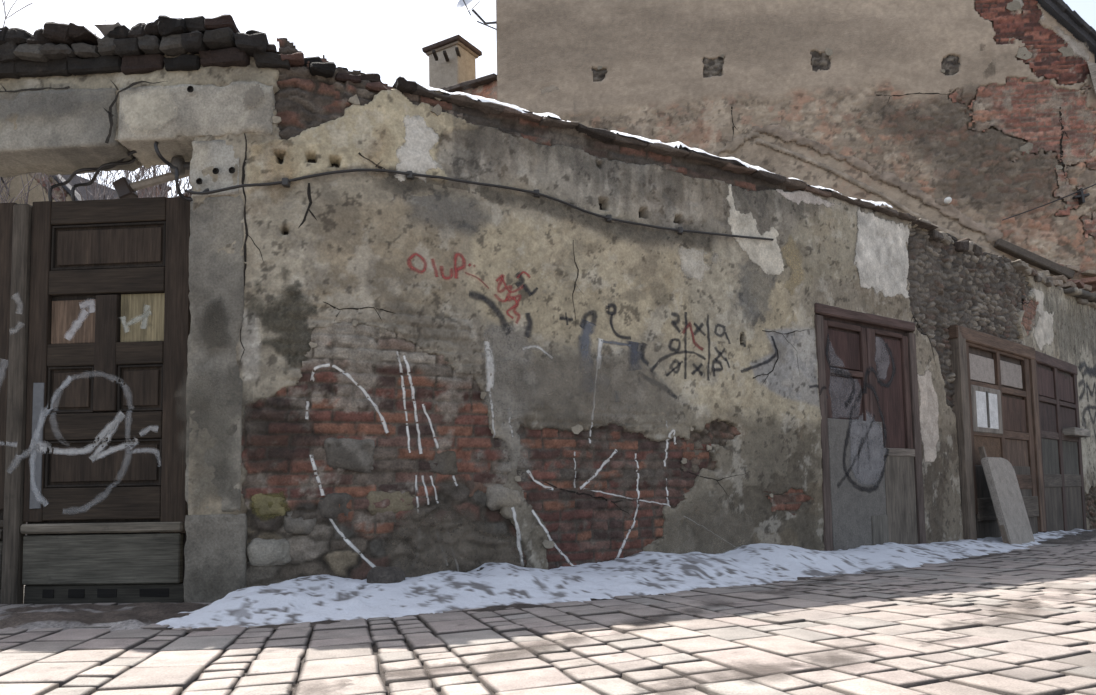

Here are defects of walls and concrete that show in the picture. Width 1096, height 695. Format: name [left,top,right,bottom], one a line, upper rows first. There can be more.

crack [0,85,70,93]
crack [104,81,168,143]
flaking render [949,0,1096,239]
flaking render [514,419,741,570]